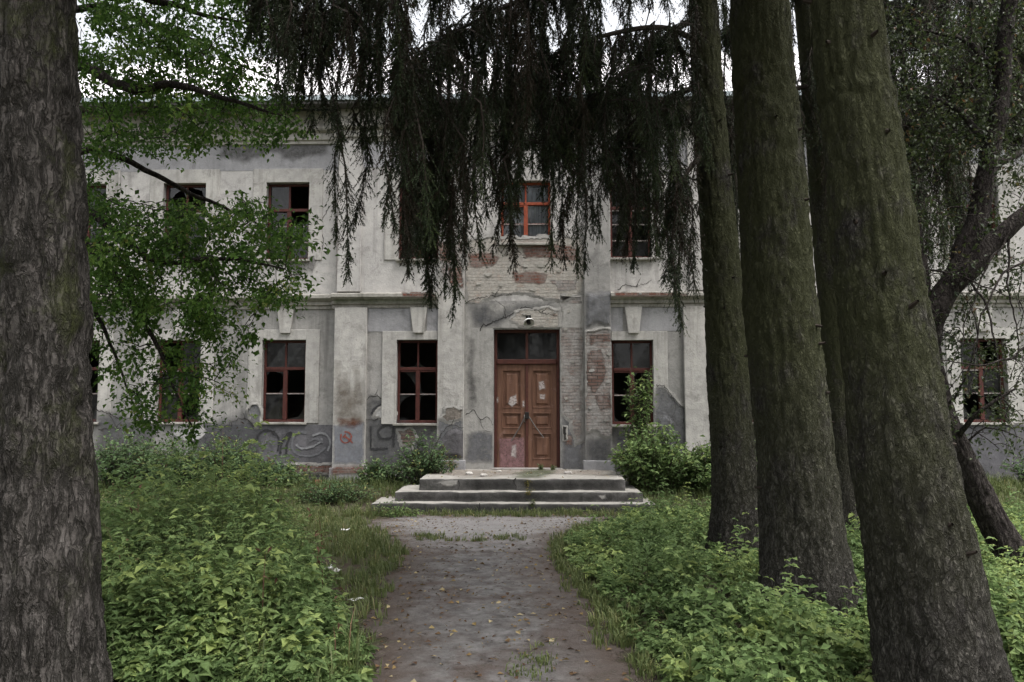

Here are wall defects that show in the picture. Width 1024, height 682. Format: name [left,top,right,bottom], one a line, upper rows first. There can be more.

crack [465,291,557,331]
flaking render [438,234,612,469]
crack [437,410,492,441]
peeling [653,386,685,461]